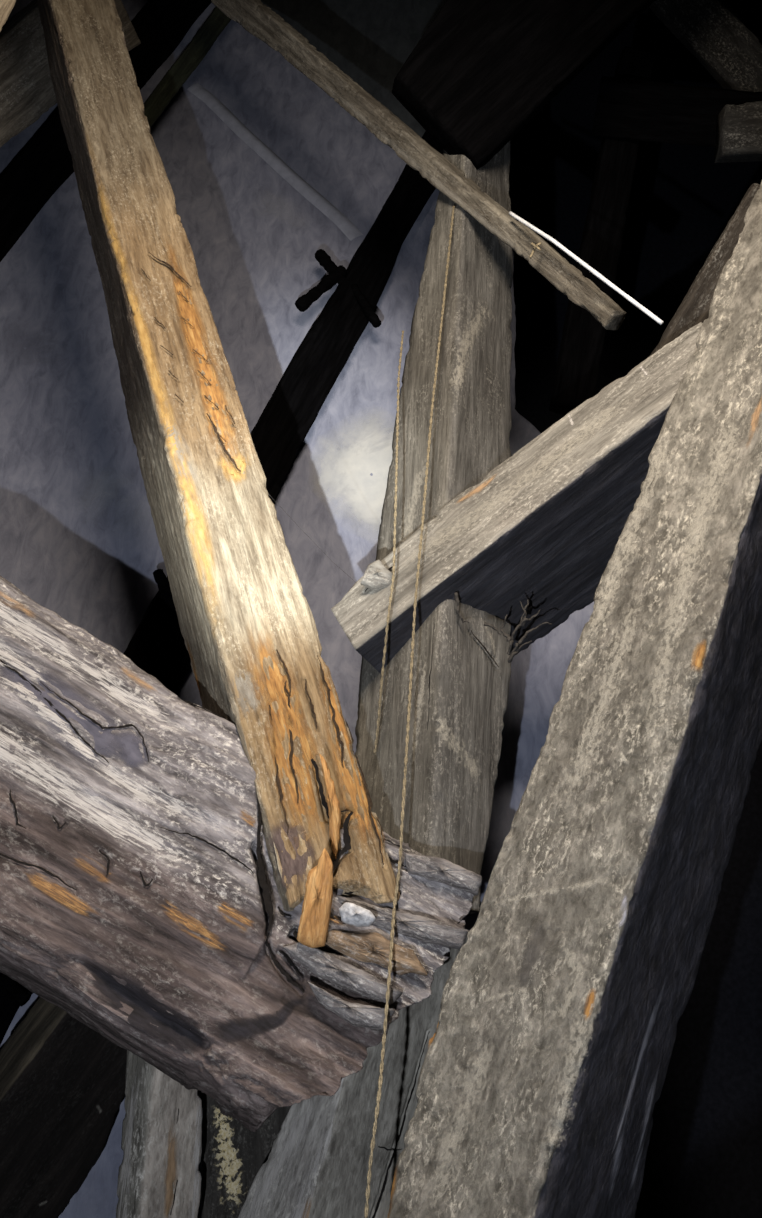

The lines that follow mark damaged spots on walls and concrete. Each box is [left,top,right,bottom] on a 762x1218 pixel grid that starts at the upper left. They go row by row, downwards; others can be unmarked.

crack [427,624,435,730]
crack [10,789,26,829]
crack [160,649,406,993]
crack [0,854,77,891]
crack [99,850,110,876]